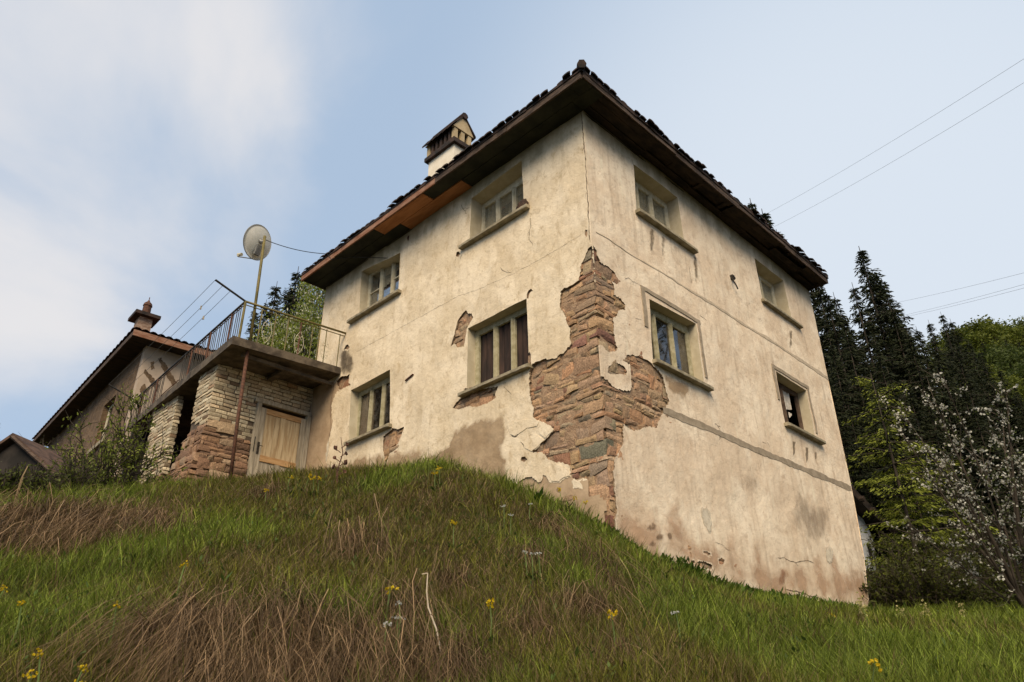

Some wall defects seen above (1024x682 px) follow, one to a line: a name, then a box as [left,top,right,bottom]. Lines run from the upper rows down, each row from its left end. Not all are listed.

crack [366,115,590,347]
flaking render [430,230,852,527]
flaking render [384,428,404,461]
water stain [620,518,659,557]
water stain [755,558,866,601]